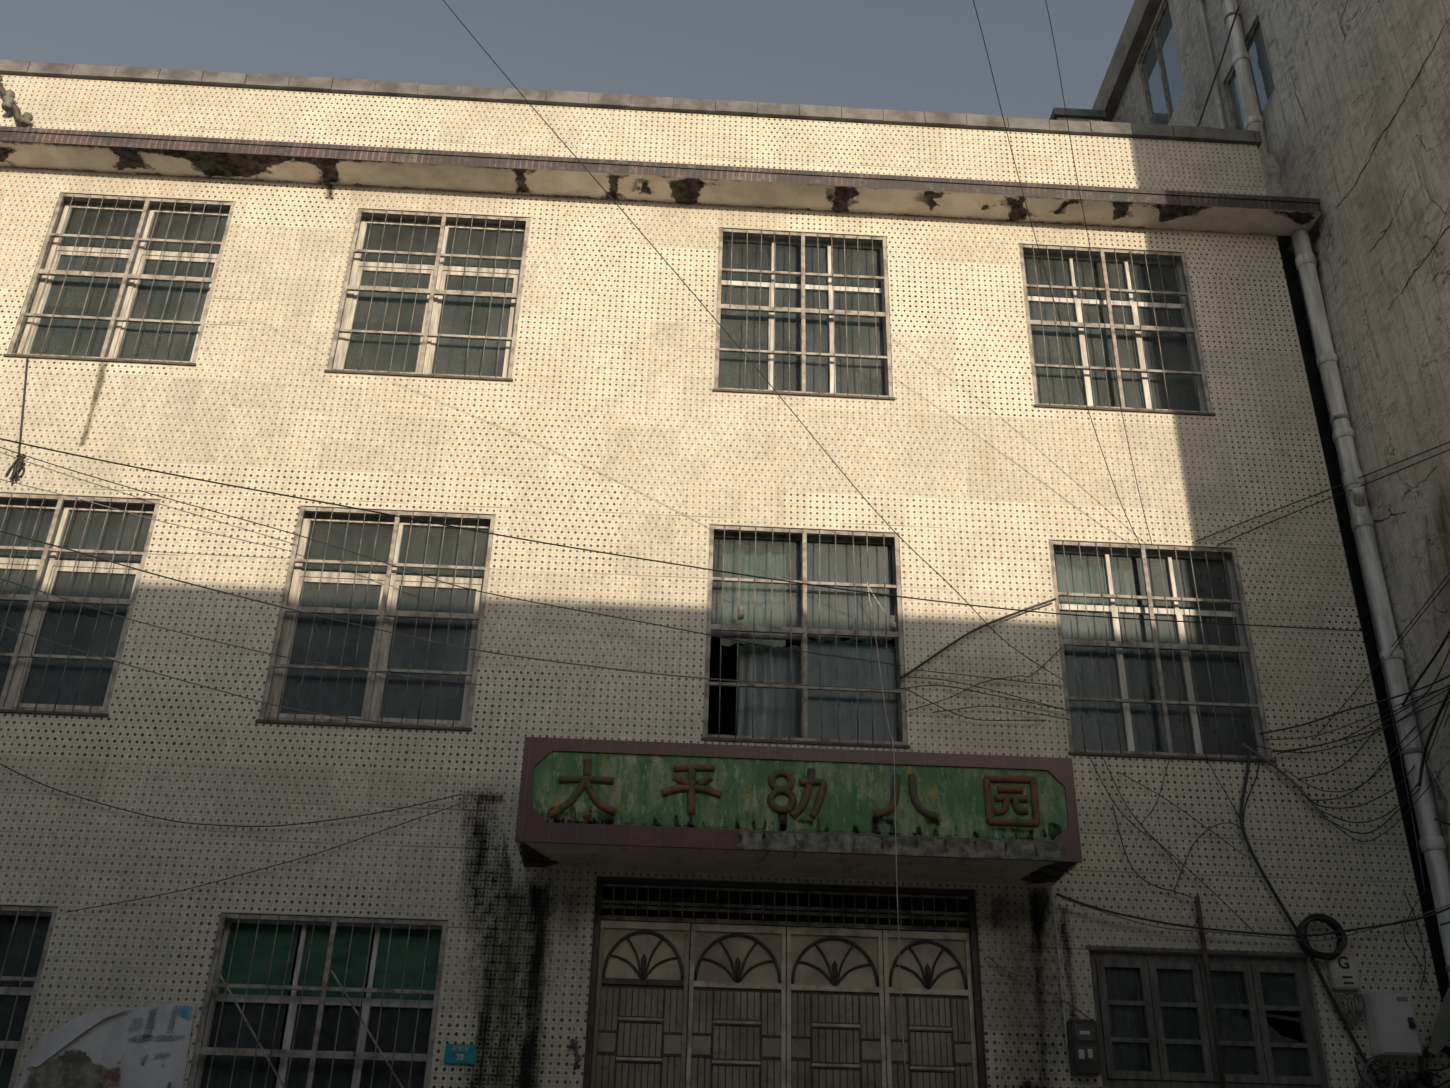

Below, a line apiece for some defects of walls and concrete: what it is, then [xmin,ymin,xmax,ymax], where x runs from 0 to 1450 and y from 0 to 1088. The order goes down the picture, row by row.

crack [1324,18,1450,217]
peeling [109,146,155,170]
peeling [165,150,341,199]
peeling [512,169,534,196]
peeling [606,174,652,200]
peeling [669,178,708,204]
peeling [827,186,860,212]
peeling [980,196,1031,221]
peeling [1112,201,1211,223]
crack [1369,176,1450,310]
water stain [463,788,553,1088]
water stain [1030,890,1075,1017]